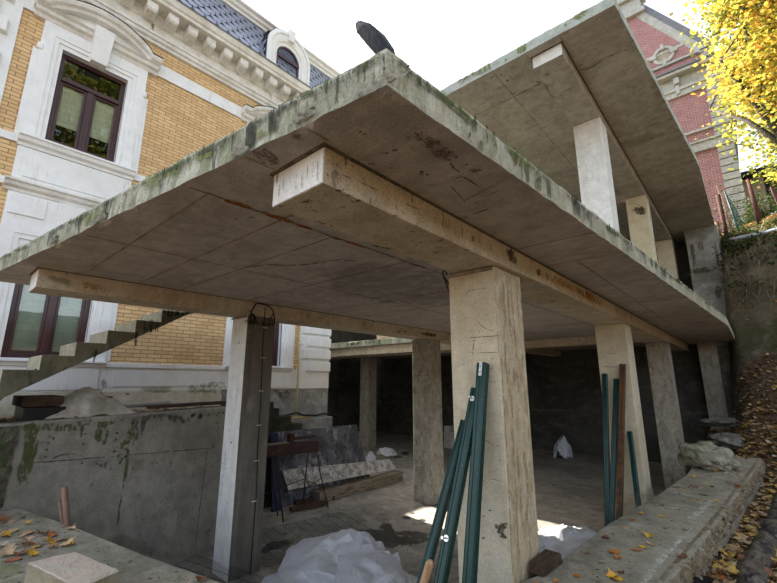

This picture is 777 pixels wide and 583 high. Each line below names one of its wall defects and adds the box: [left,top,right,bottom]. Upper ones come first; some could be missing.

leakage [324,64,359,93]
leakage [400,58,430,94]
leakage [268,99,292,132]
leakage [245,117,284,197]
leakage [407,132,498,250]
corrosion [209,193,425,268]
leakage [21,421,115,445]
leakage [132,413,209,445]